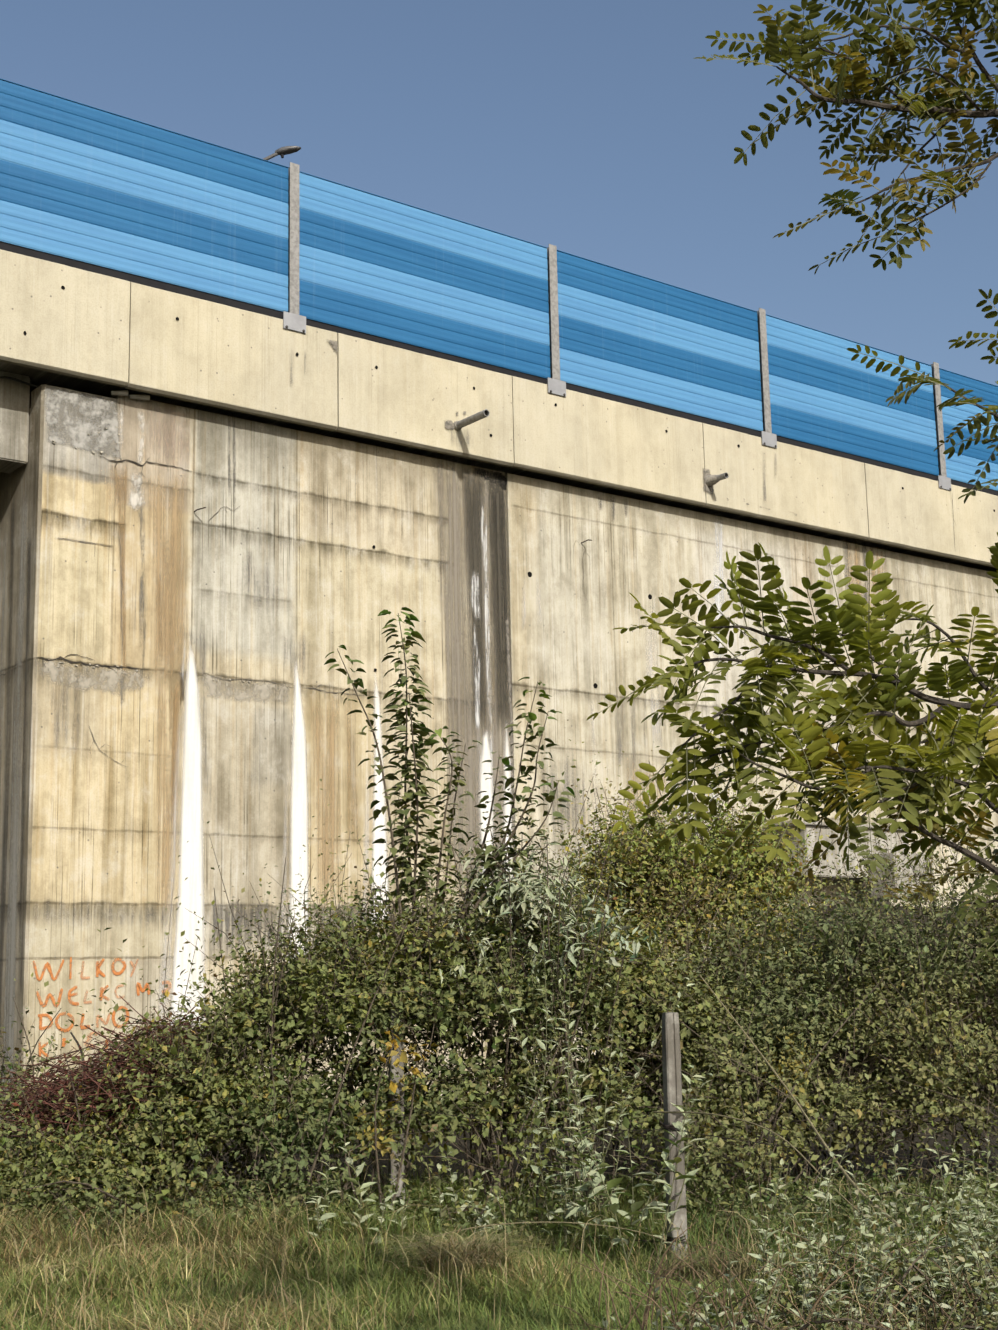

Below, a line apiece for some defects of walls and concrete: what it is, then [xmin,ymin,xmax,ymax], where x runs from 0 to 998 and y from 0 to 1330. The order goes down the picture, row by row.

crack [0,538,148,676]
peeling [46,389,144,461]
peeling [130,476,142,508]
rust [150,484,184,670]
damp [438,464,512,898]
damp [162,639,358,1026]
damp [371,686,389,925]